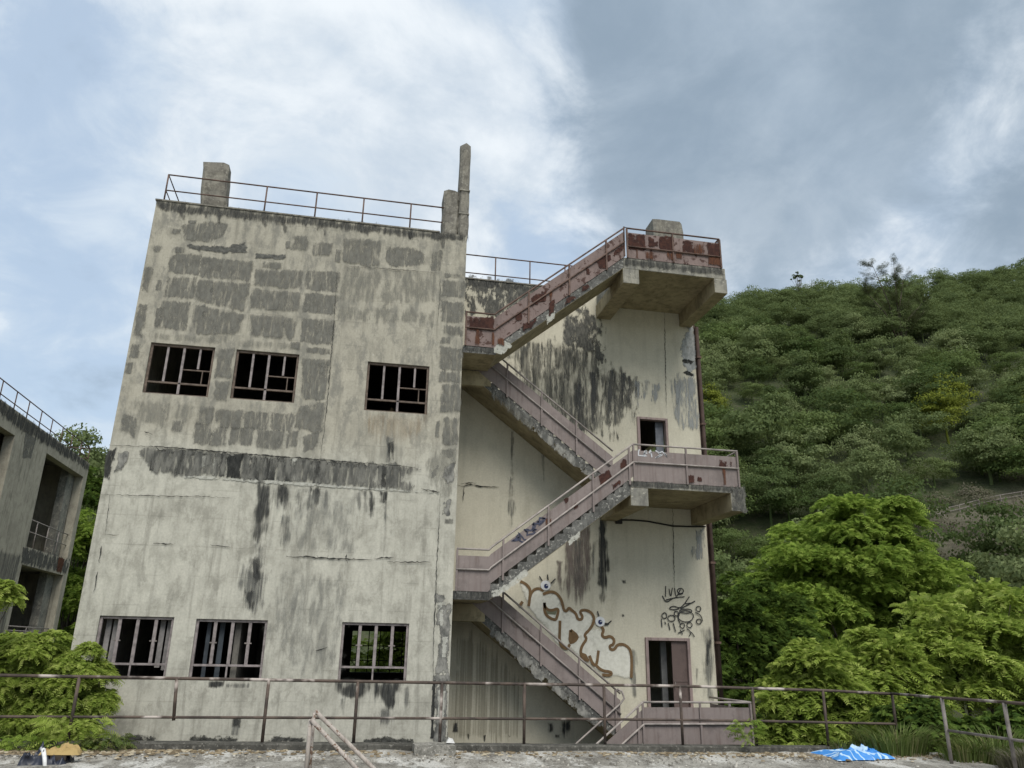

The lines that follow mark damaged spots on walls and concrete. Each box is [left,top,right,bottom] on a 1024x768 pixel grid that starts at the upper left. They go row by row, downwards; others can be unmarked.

damp [156,200,464,247]
corrosion [469,316,504,346]
damp [509,306,700,439]
corrosion [515,233,721,331]
crack [94,266,495,679]
corrosion [599,459,627,489]
damp [239,483,327,609]
damp [557,520,609,601]